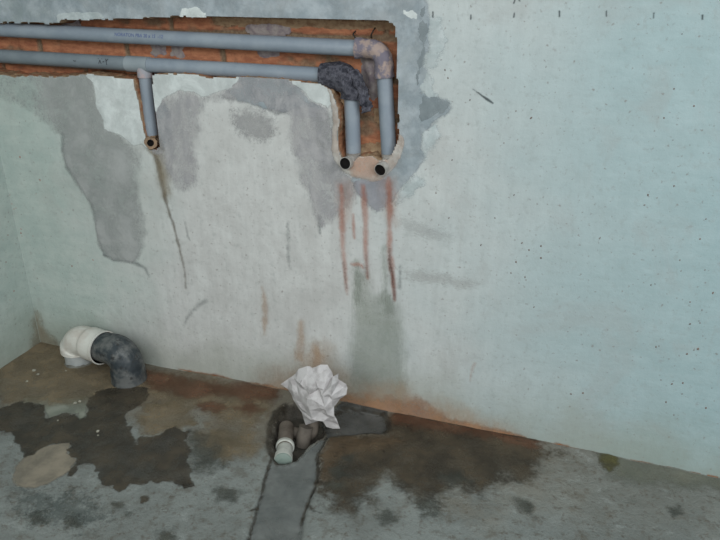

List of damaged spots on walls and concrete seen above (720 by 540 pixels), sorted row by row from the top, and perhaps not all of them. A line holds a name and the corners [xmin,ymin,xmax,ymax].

flaking render [0,7,400,161]
flaking render [152,72,426,225]
water stain [0,387,230,492]
corrosion [146,369,289,412]
corrosion [340,395,538,447]